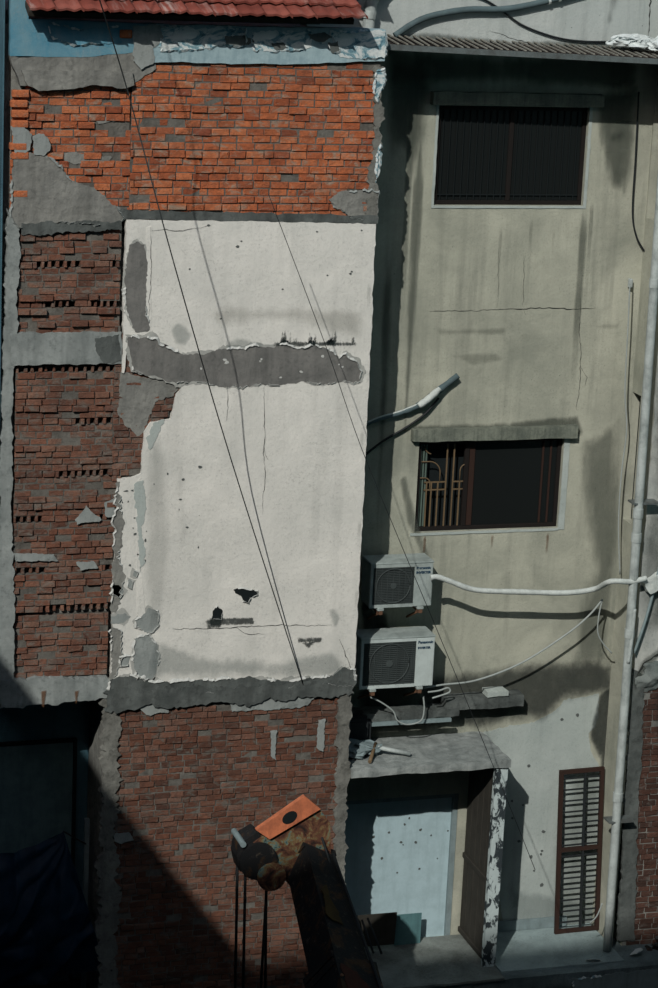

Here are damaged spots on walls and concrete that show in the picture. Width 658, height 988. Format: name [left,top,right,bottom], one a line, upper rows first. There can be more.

peeling [48,22,388,103]
spalling [9,126,125,236]
spalling [329,143,383,231]
spalling [95,239,366,450]
crack [448,253,593,406]
spalling [14,553,58,562]
spalling [316,719,326,751]
peeling [483,693,600,925]